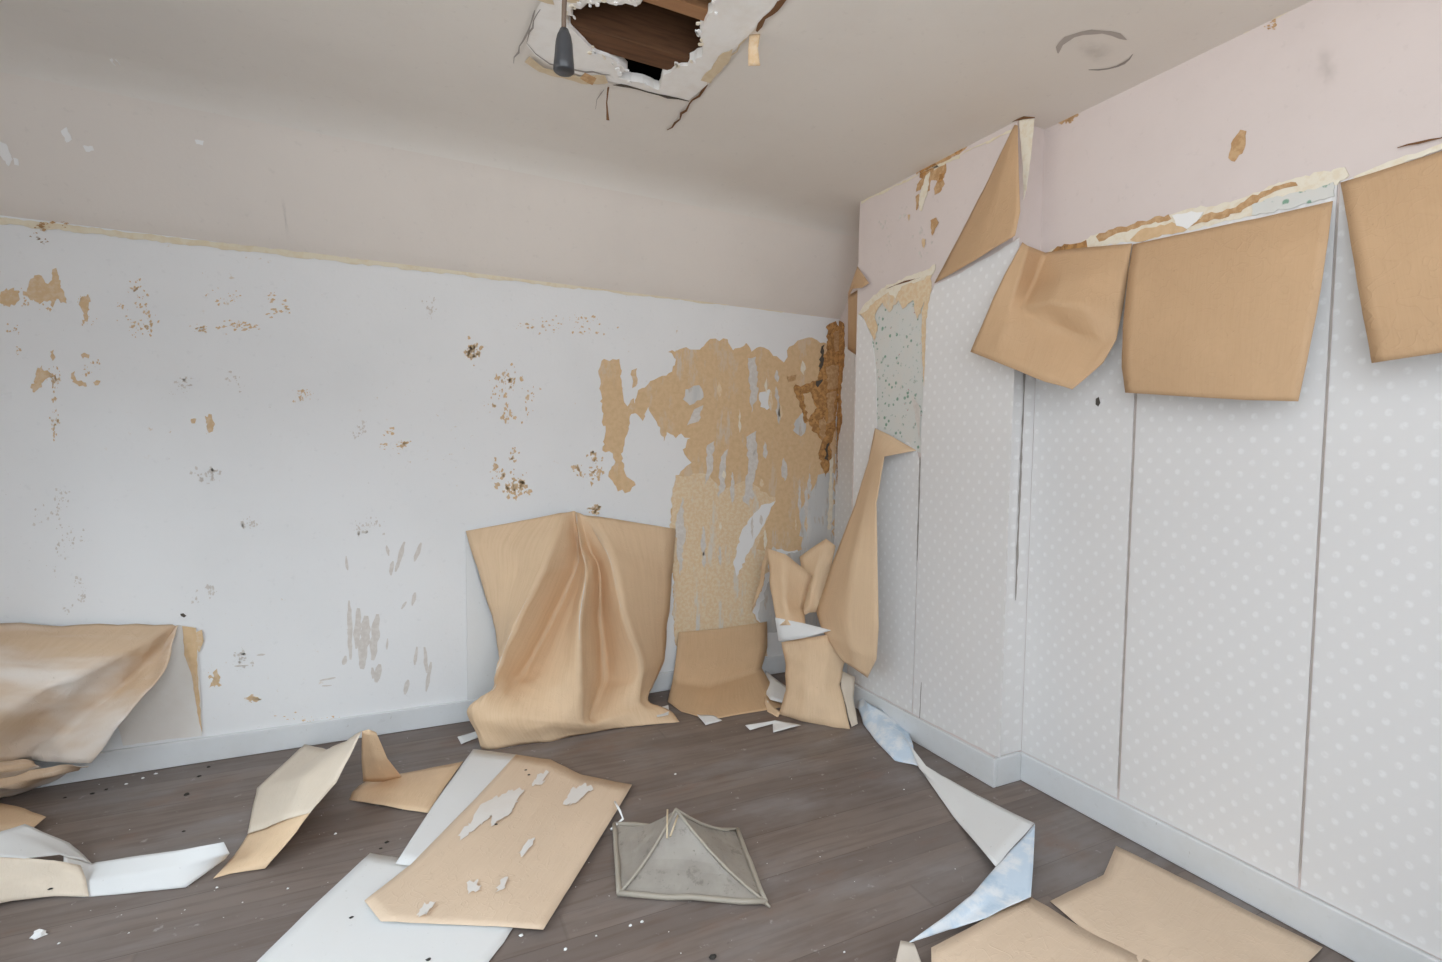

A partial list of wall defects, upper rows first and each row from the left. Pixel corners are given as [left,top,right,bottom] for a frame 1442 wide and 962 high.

spalling [513,0,786,130]
peeling [1228,130,1247,162]
peeling [908,147,967,248]
peeling [0,268,97,355]
peeling [30,350,100,441]
peeling [571,337,916,678]